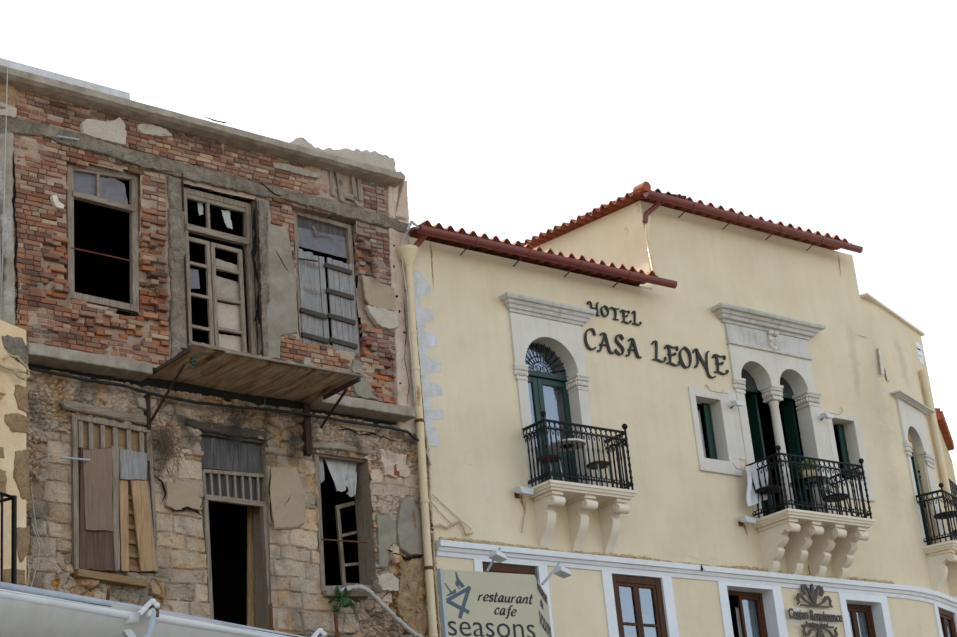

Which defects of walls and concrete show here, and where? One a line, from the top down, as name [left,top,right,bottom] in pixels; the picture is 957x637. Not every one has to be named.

spalling [0,83,17,118]
peeling [1,211,12,242]
spalling [168,208,187,263]
spalling [258,200,328,382]
spalling [378,449,410,479]